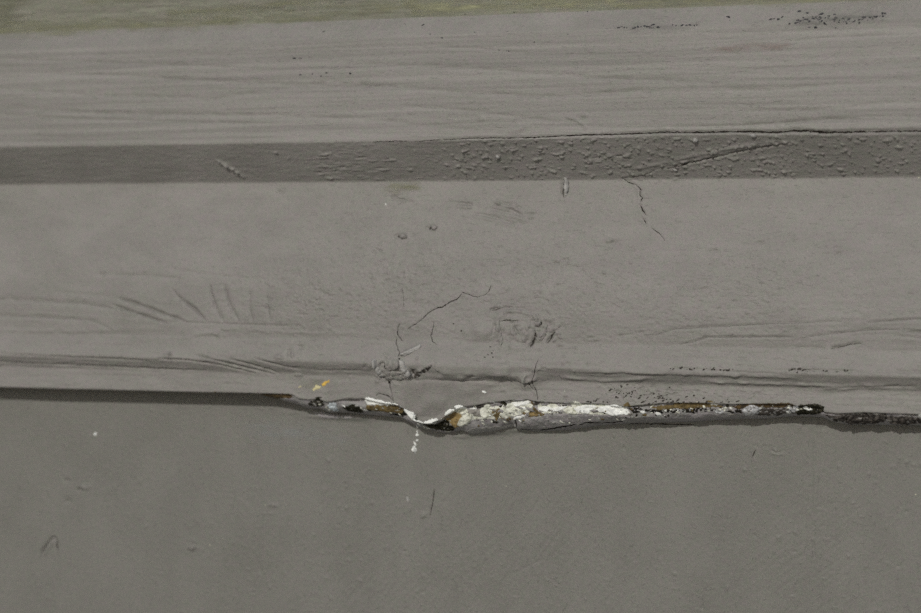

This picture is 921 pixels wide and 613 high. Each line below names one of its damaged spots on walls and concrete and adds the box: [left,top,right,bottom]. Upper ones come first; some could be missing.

crack [419,130,921,239]
crack [396,286,491,356]
peeling [308,380,760,433]
peeling [786,403,824,415]